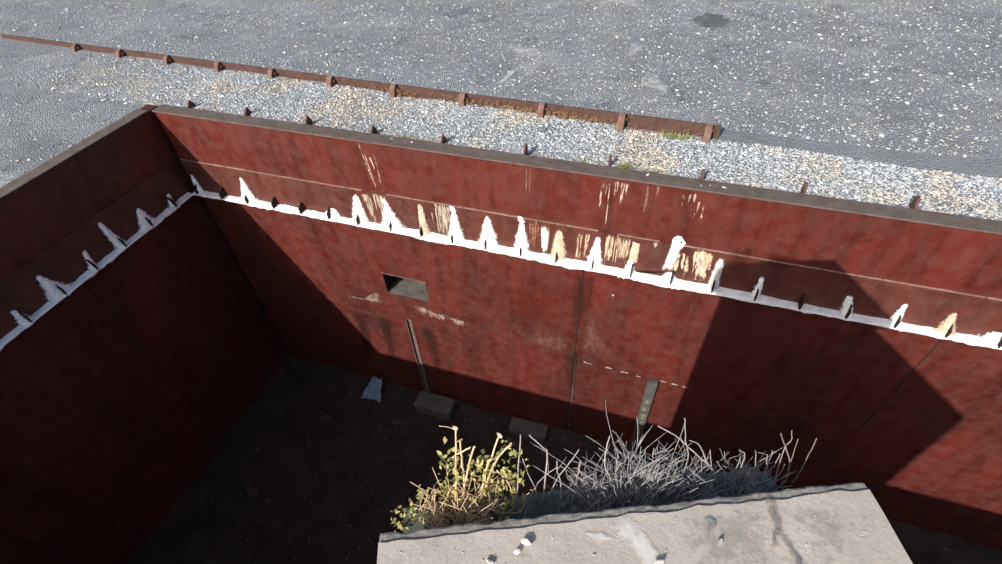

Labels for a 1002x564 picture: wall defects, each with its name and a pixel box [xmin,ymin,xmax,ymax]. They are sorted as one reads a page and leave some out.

damp [359,145,386,221]
damp [431,203,452,233]
damp [600,182,628,224]
peeling [541,227,550,251]
damp [576,233,590,258]
damp [604,236,631,263]
peeling [673,250,713,279]
crack [765,499,803,564]